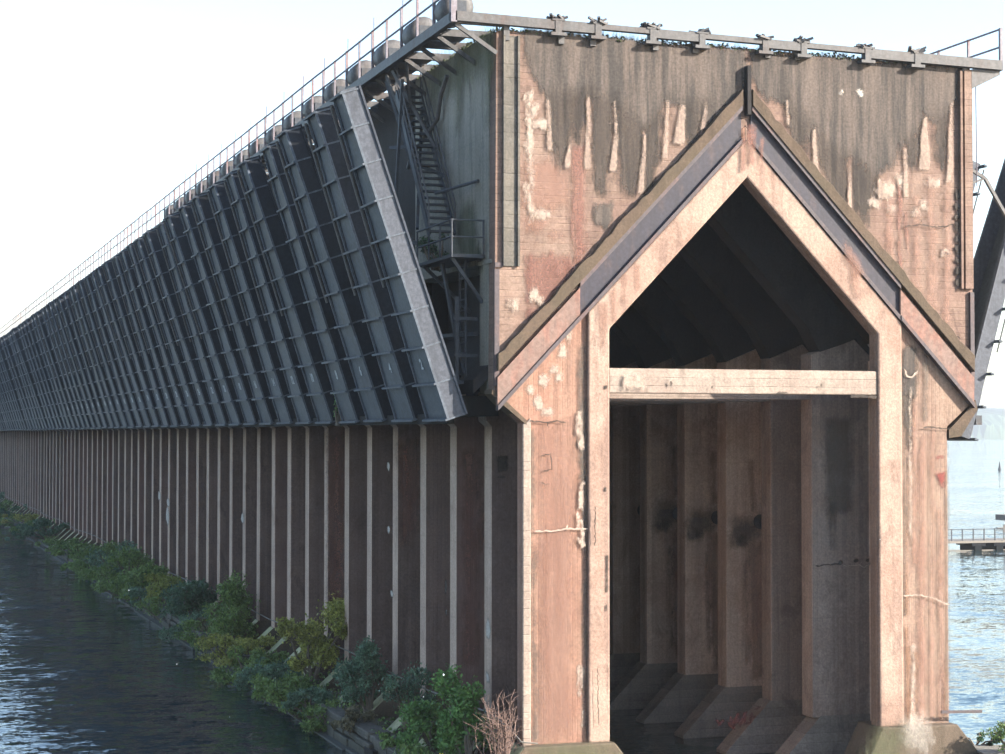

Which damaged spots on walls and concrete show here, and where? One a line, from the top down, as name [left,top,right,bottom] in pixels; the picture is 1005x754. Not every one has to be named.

peeling [523,91,552,220]
peeling [610,101,618,171]
peeling [638,135,646,193]
peeling [662,102,686,158]
damp [521,28,961,230]
peeling [868,103,961,286]
peeling [529,289,544,305]
damp [827,420,850,527]